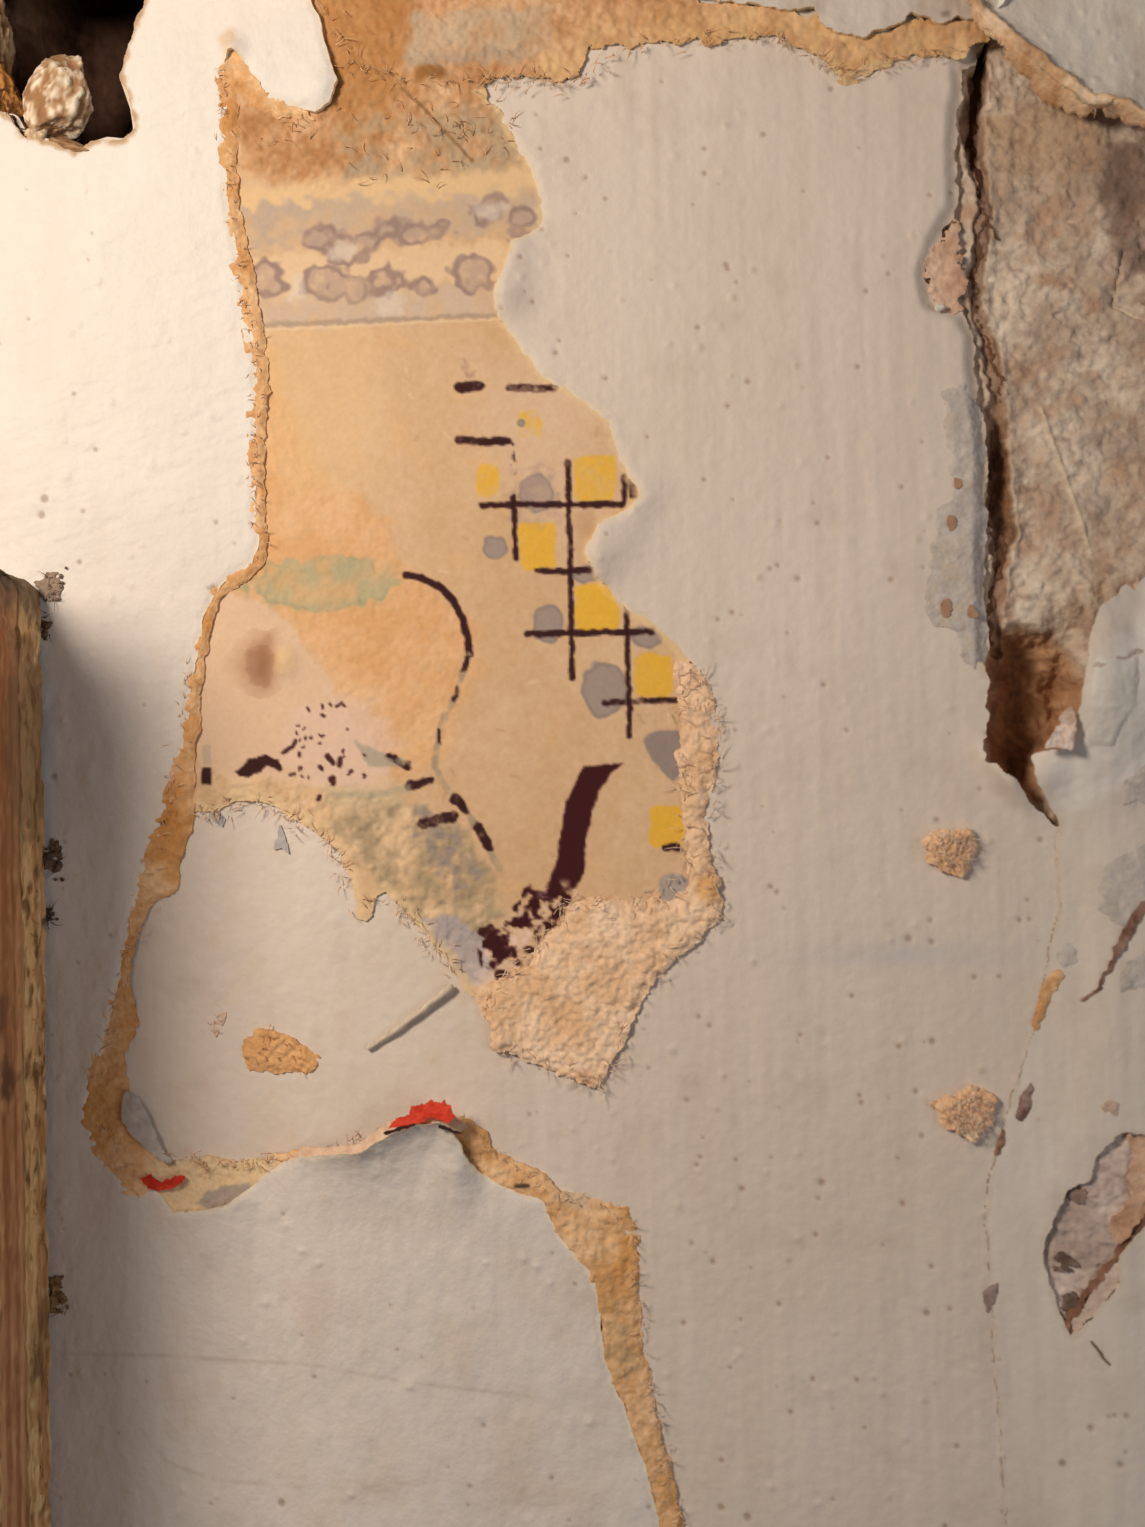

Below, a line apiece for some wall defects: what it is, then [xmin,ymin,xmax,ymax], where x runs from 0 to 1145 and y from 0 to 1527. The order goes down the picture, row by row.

flaking render [713,0,1145,827]
peeling [0,0,660,1527]
peeling [983,1283,998,1312]
crack [983,903,1061,1523]
peeling [1043,1132,1145,1333]
peeling [1101,1099,1120,1116]